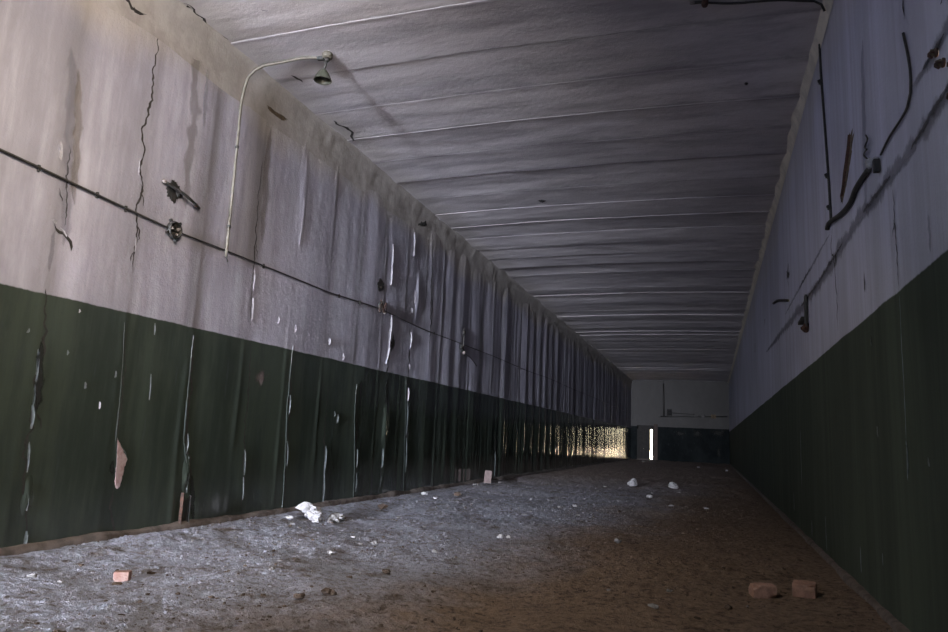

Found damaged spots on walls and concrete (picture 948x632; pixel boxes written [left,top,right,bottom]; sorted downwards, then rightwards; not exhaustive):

crack [130,38,159,274]
peeling [109,323,128,531]